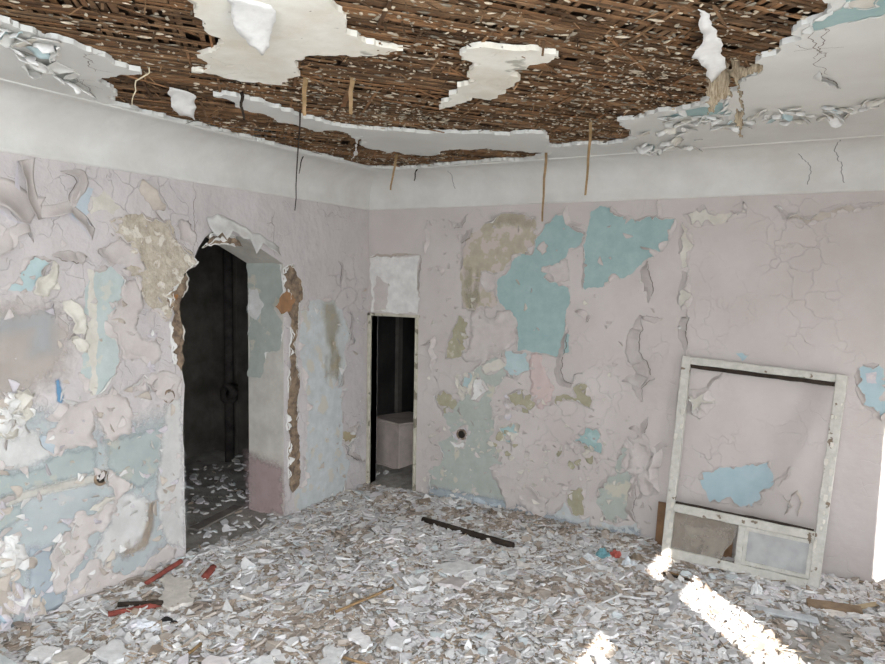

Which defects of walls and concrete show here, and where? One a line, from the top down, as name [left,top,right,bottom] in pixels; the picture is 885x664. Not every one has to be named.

flaking render [0,0,885,167]
crack [798,28,841,89]
crack [834,140,845,183]
peeling [0,211,405,632]
peeling [417,201,747,535]
peeling [855,363,885,421]
peeling [698,461,775,508]